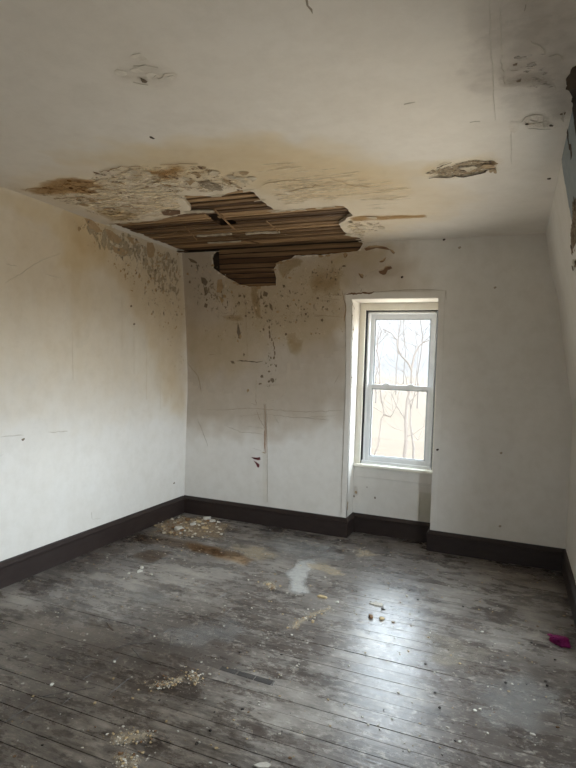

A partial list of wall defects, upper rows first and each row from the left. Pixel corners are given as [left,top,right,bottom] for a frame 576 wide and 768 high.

water stain [25,163,407,221]
flaking render [74,189,395,347]
flaking render [427,160,498,179]
peeling [562,66,576,274]